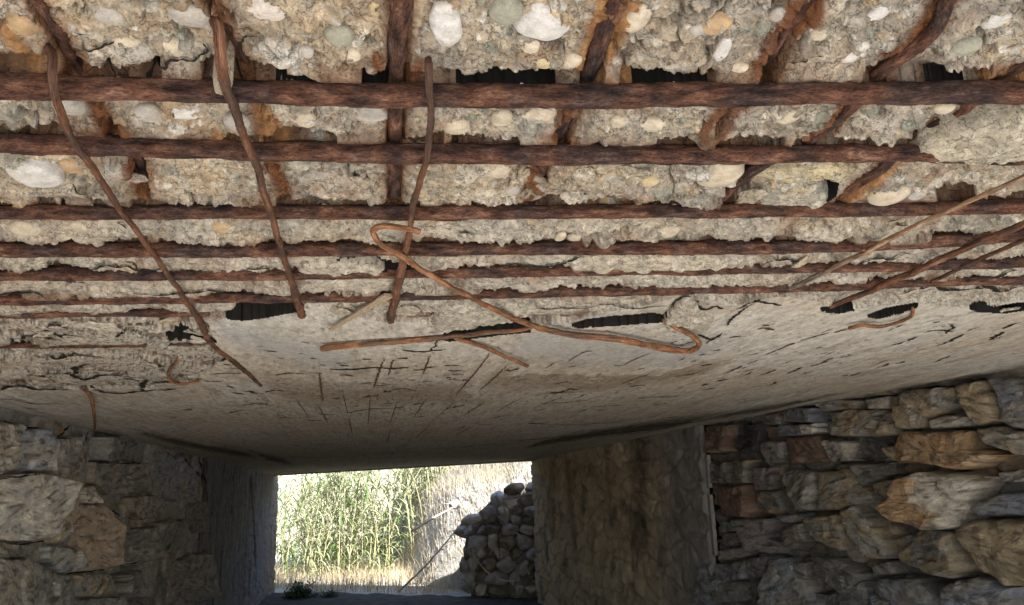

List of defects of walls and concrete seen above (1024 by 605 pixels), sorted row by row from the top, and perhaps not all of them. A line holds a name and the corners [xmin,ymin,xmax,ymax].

spalling [405,0,1024,85]
rust [881,2,937,60]
spalling [0,0,391,145]
rust [92,102,132,139]
rust [213,107,290,142]
spalling [402,104,961,151]
rust [123,157,150,200]
rust [838,161,902,203]
spalling [0,153,1024,390]
crack [851,253,910,266]
crack [540,296,782,344]
crack [331,341,468,414]